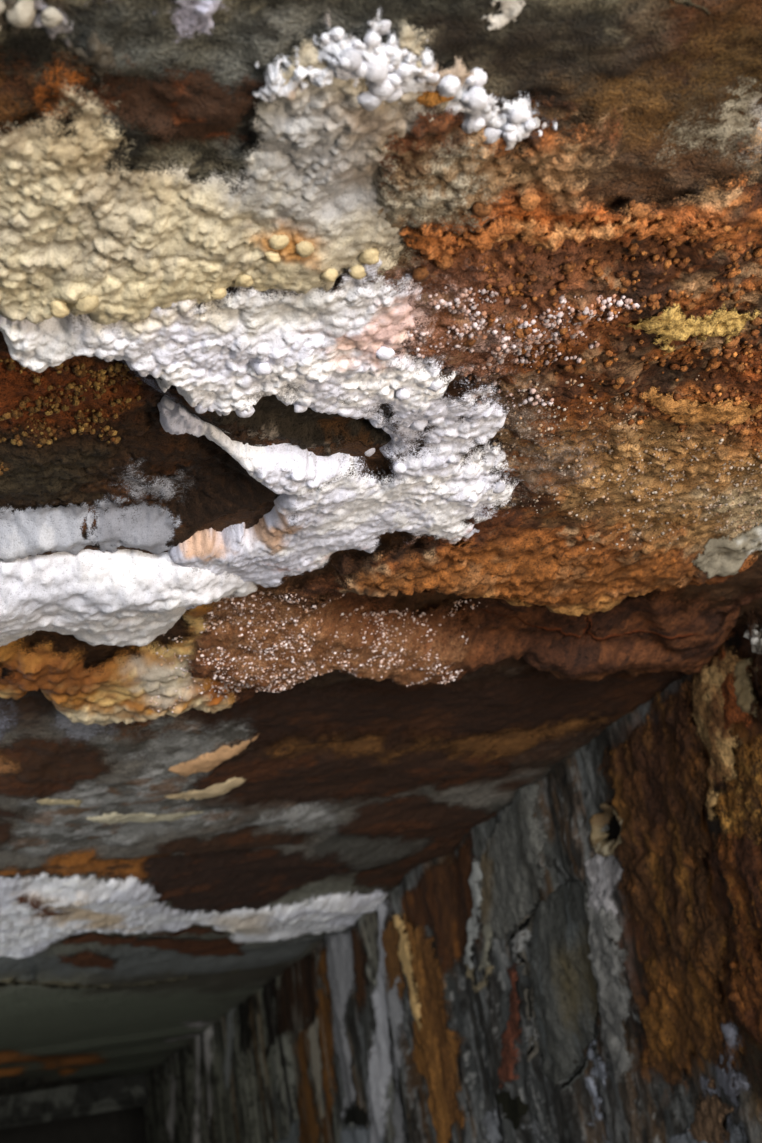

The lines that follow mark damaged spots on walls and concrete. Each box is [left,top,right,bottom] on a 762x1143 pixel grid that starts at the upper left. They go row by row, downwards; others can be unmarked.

corrosion [0,47,266,149]
corrosion [654,0,762,162]
leakage [0,0,557,1143]
corrosion [106,96,762,1143]
leakage [744,623,762,654]
corrosion [0,730,117,801]
corrosion [0,825,354,917]
corrosion [56,926,245,970]
leakage [584,854,641,1143]
corrosion [0,1049,108,1077]
spalling [340,1104,368,1130]
spalling [496,1090,529,1130]